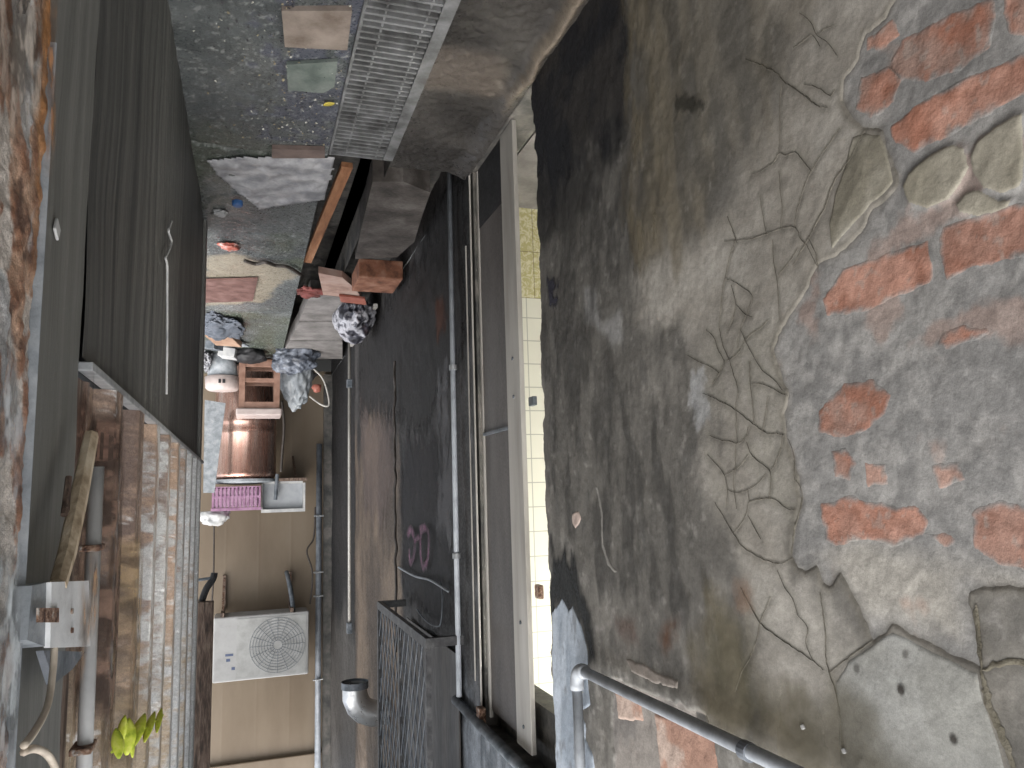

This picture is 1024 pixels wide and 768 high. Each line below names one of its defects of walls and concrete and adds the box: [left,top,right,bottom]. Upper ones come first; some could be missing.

crack [691,58,872,743]
spalling [774,0,1024,666]